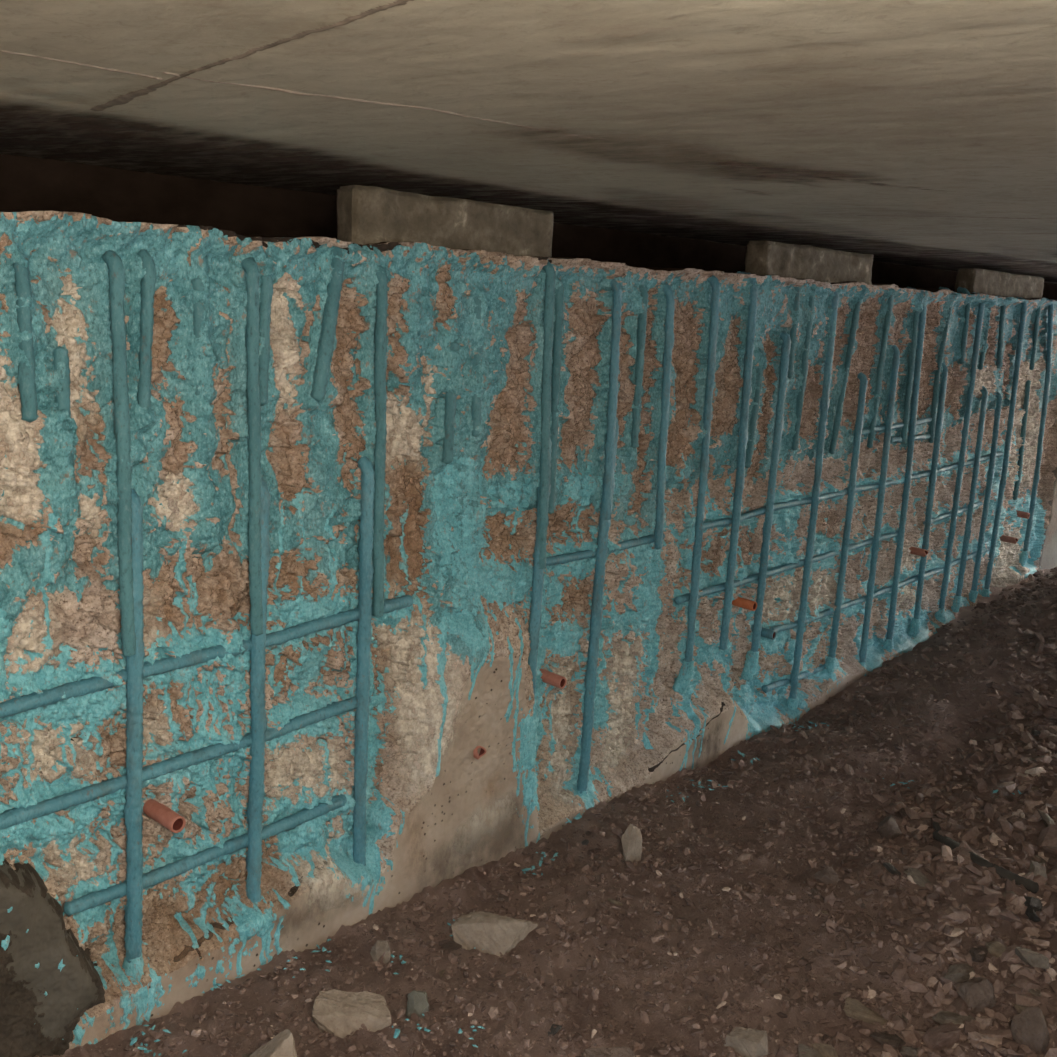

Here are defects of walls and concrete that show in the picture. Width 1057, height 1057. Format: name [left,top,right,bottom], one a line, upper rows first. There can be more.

spalling [0,211,1057,1048]
crack [648,702,725,772]